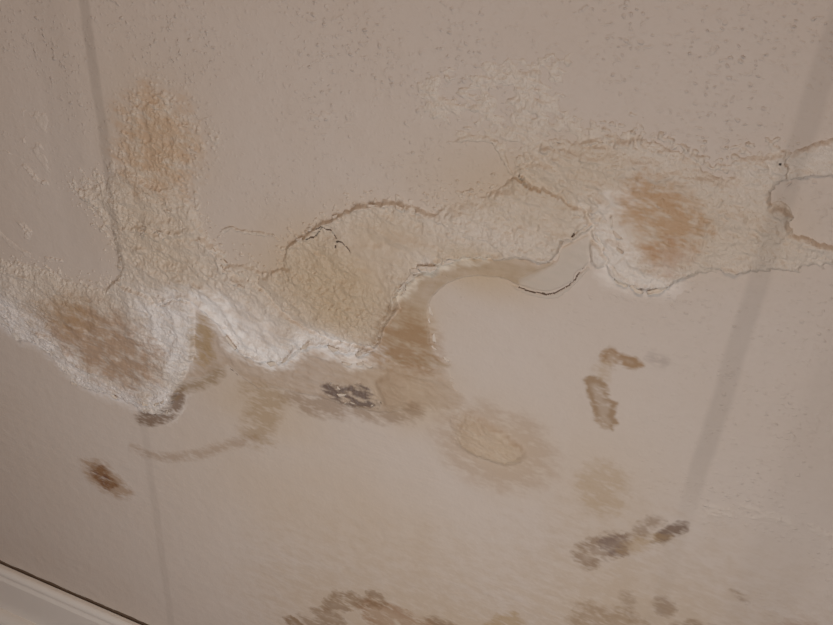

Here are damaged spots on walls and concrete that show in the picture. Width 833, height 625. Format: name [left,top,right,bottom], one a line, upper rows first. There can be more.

crack [518,268,583,296]
leakage [566,178,698,306]
flaking render [318,381,380,406]
leakage [0,248,833,625]